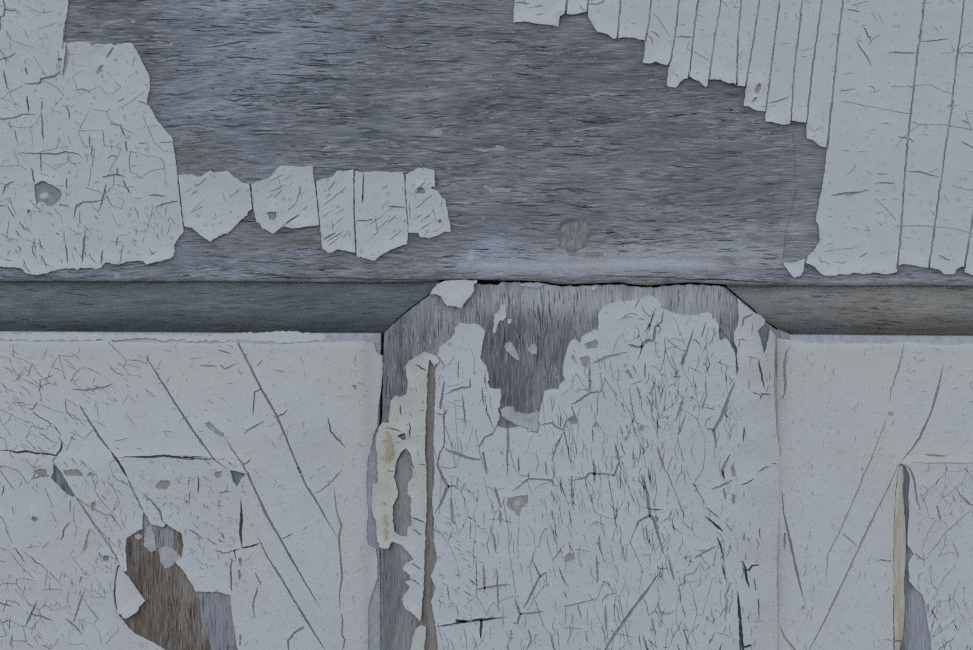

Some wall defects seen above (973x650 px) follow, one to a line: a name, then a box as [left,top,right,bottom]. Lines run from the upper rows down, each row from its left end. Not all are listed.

peeling [0,0,973,433]
crack [517,0,973,269]
peeling [103,513,242,650]
peeling [366,360,438,650]
crack [0,300,973,650]
peeling [506,495,528,516]
peeling [893,463,931,650]